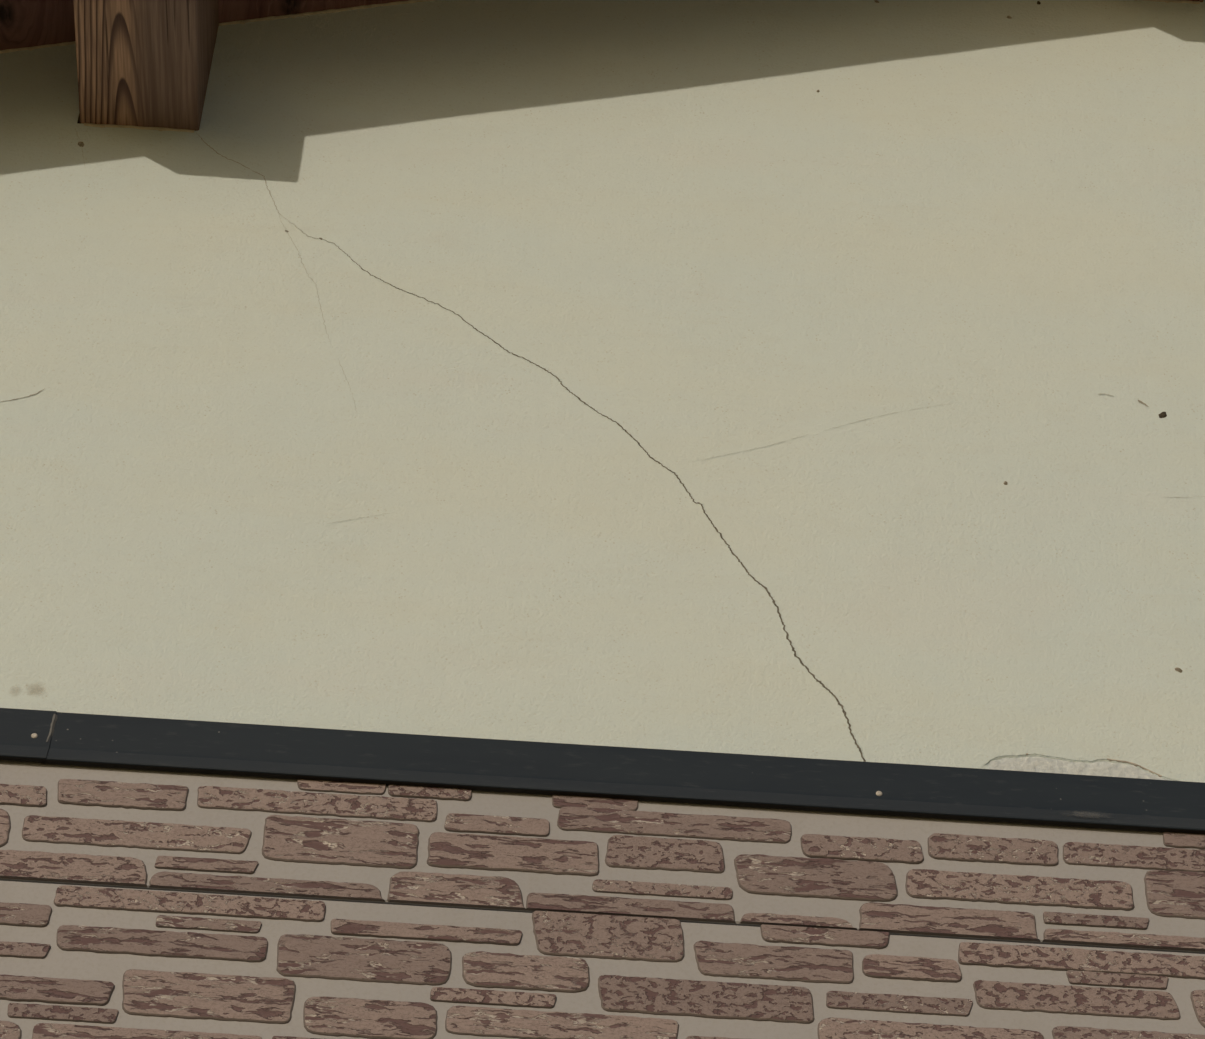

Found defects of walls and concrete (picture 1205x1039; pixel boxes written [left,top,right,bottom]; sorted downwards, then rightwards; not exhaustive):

crack [196,132,960,762]
spalling [981,751,1180,781]